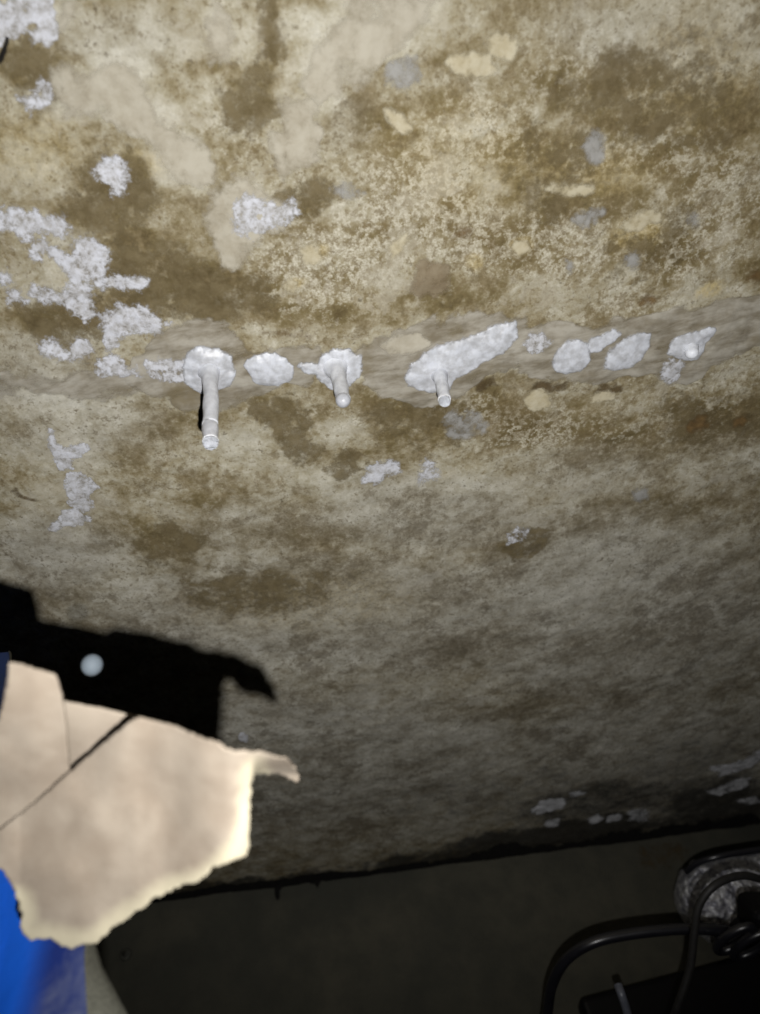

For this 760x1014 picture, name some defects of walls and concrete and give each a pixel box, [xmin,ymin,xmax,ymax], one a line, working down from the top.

leakage [0,0,58,112]
leakage [0,146,334,463]
leakage [47,428,100,532]
leakage [323,448,402,485]
leakage [707,750,760,805]
leakage [531,791,585,828]
leakage [588,809,650,824]